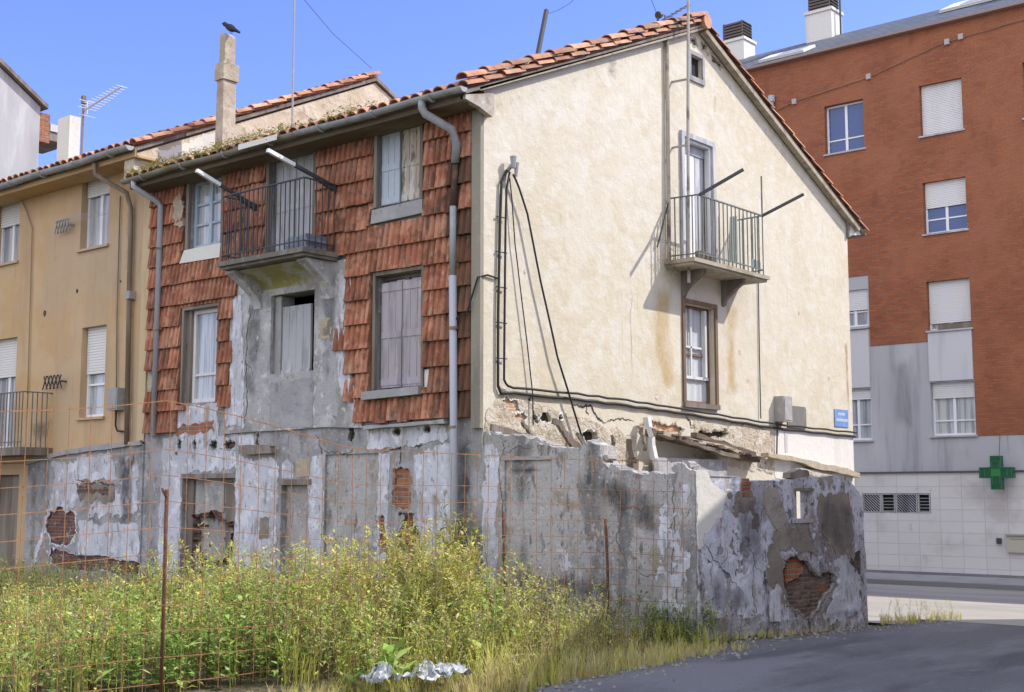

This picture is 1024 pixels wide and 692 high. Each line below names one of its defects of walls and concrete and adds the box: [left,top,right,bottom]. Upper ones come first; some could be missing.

peeling [28,403,294,588]
peeling [346,419,459,592]
flaking render [500,387,565,428]
spalling [582,428,600,442]
crack [571,404,634,423]
peeling [655,478,863,625]